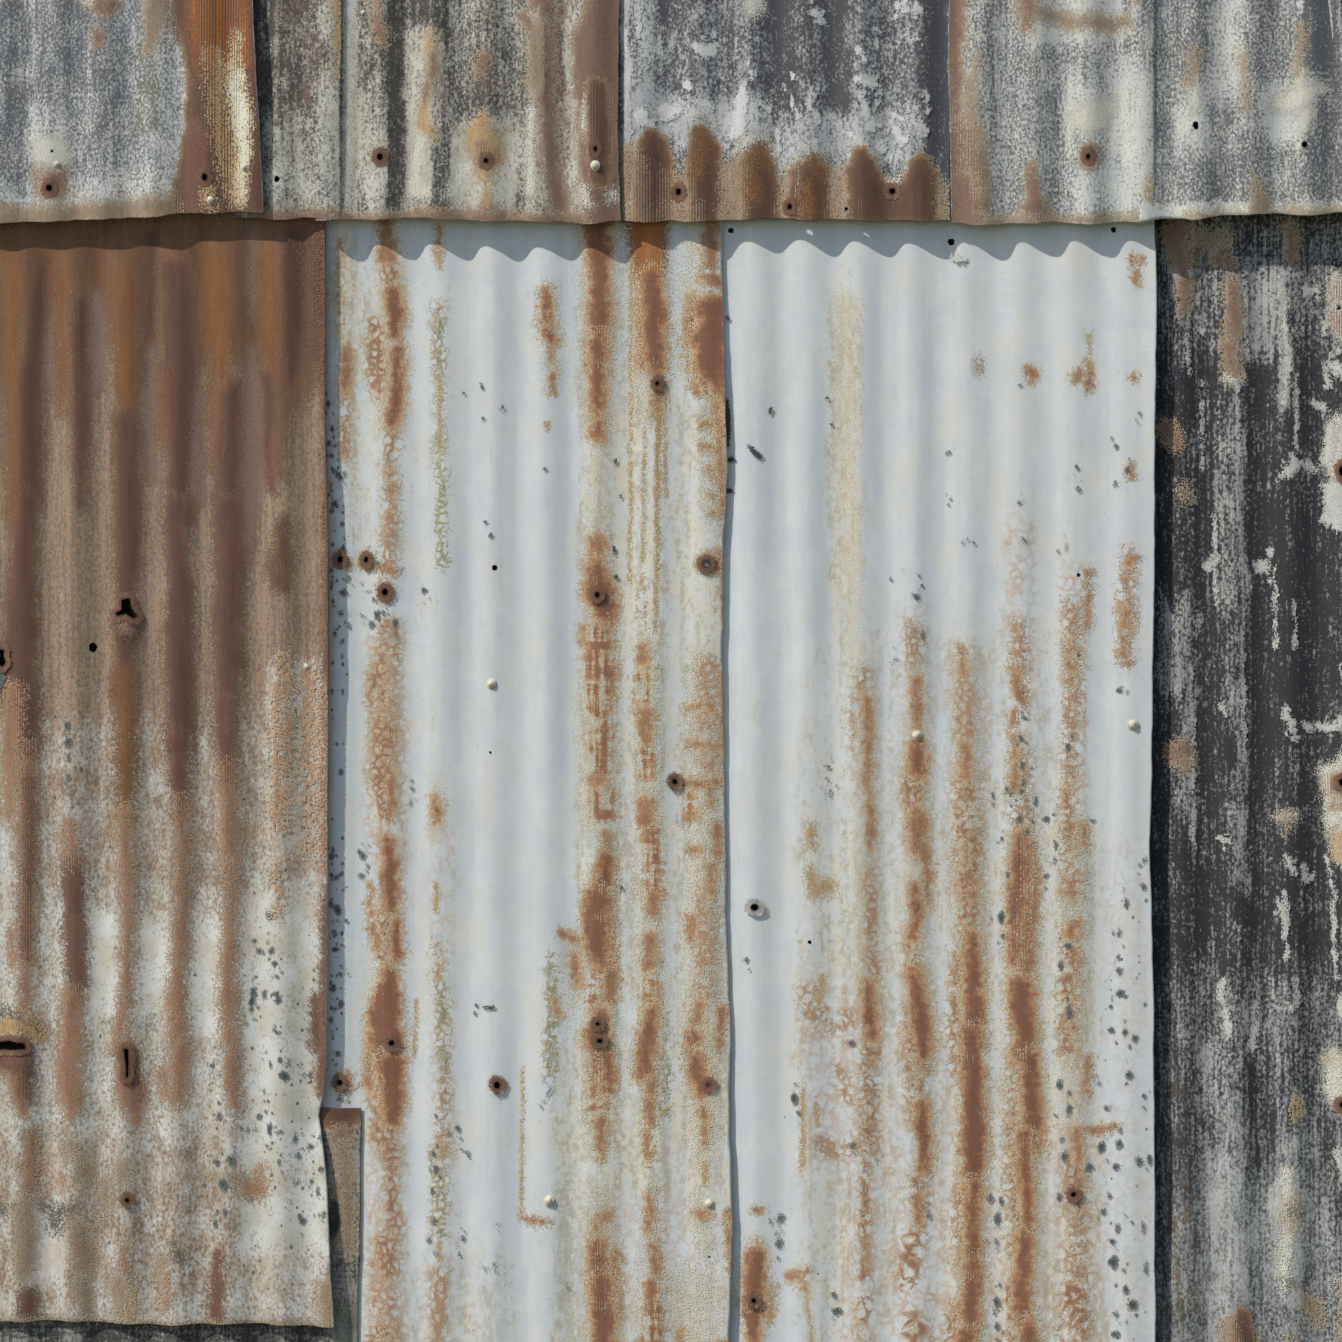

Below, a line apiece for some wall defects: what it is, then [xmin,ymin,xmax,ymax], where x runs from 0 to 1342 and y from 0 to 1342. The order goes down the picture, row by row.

corrosion [1148,171,1342,389]
peeling [1273,270,1342,490]
peeling [1252,546,1274,585]
corrosion [0,481,334,1328]
corrosion [260,221,420,1342]
corrosion [793,541,1145,1342]
peeling [1215,833,1233,853]
peeling [1273,896,1291,930]
peeling [1282,852,1317,885]
peeling [1280,703,1342,743]
corrosion [422,932,459,1342]
corrosion [576,1178,818,1342]